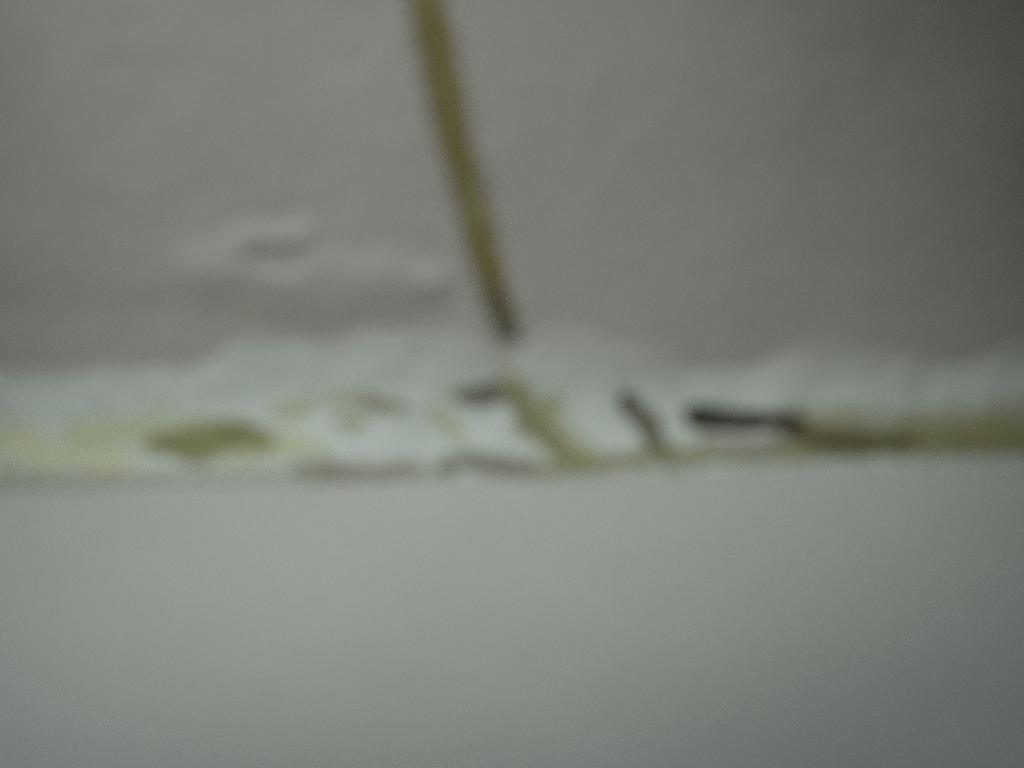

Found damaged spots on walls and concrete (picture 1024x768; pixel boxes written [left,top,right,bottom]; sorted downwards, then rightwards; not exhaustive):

crack [294,0,1024,480]
spalling [450,381,531,408]
water stain [0,420,326,473]
spalling [619,394,673,462]
spalling [687,407,807,437]